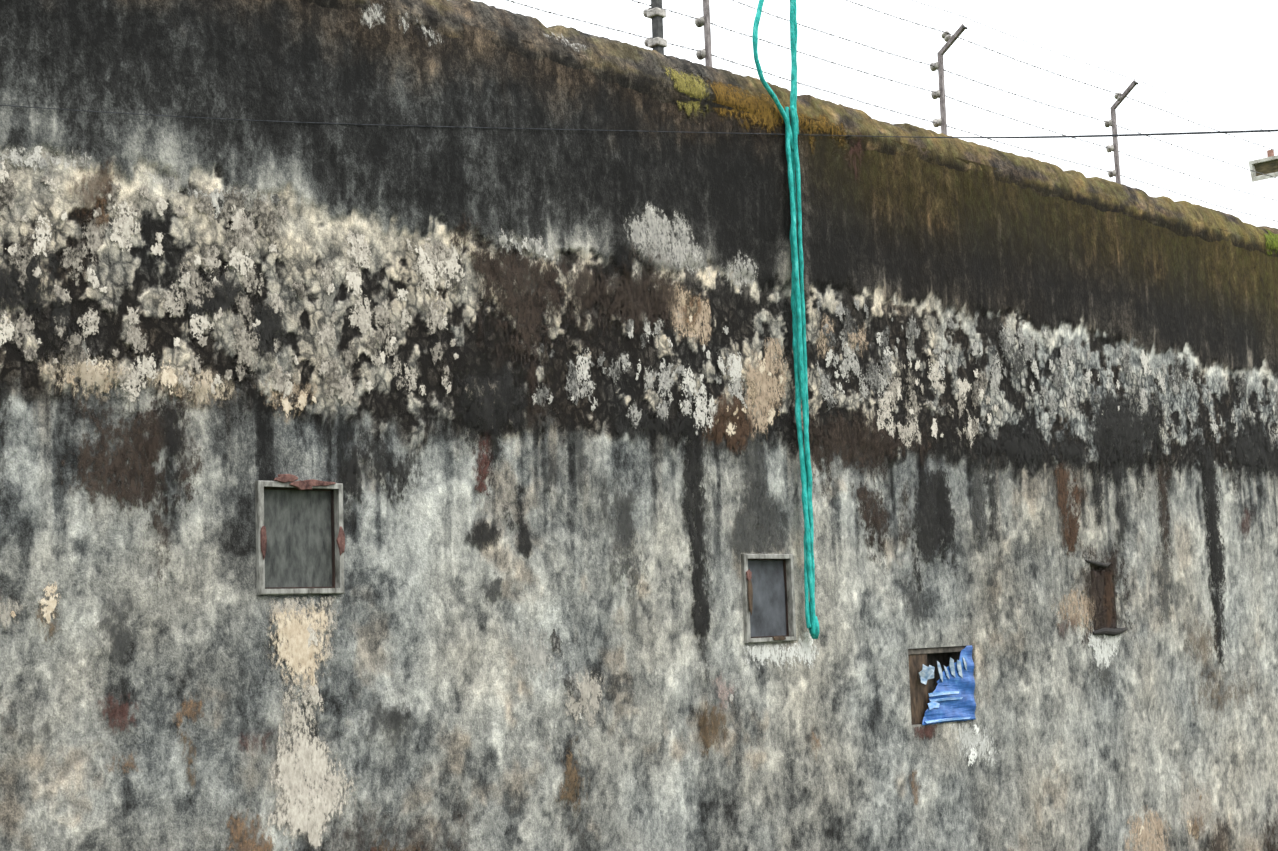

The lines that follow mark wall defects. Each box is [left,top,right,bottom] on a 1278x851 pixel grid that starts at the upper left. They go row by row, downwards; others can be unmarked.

leakage [0,250,72,339]
leakage [184,274,242,329]
leakage [450,213,681,493]
leakage [61,384,203,584]
rust [274,474,336,490]
leakage [465,485,532,558]
leakage [615,409,715,680]
leakage [803,410,957,630]
rust [1054,464,1088,555]
leakage [971,388,1173,648]
leakage [1197,408,1278,666]
flaking render [267,597,355,849]